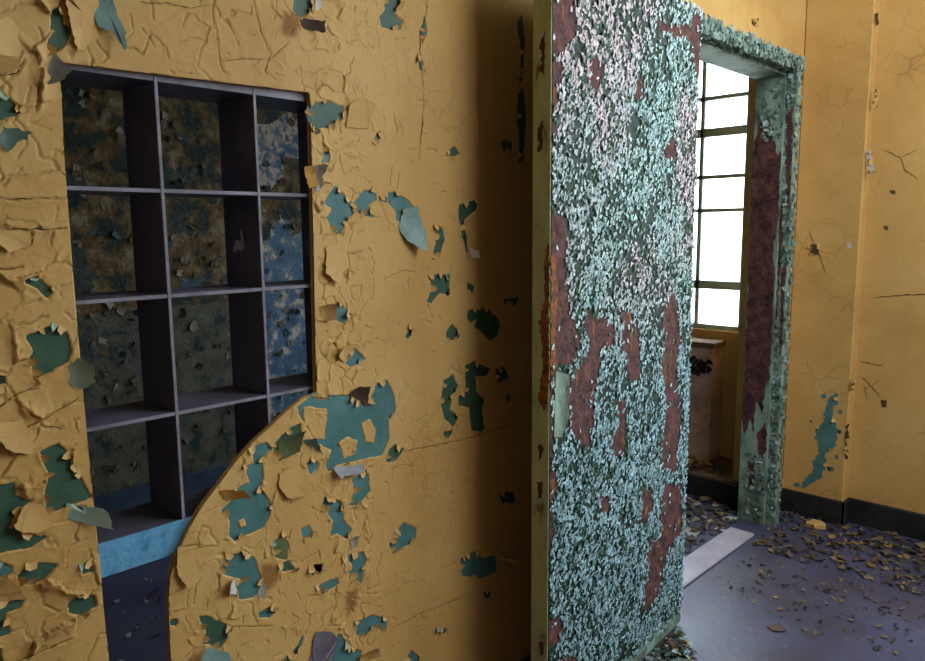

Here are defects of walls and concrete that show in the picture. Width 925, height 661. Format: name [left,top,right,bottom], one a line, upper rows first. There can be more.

crack [138,0,239,75]
corrosion [537,0,578,152]
corrosion [657,12,701,78]
crack [0,227,67,270]
peeling [23,302,144,403]
peeling [217,380,404,618]
peeling [257,97,444,379]
peeling [439,360,509,440]
corrosion [537,214,640,556]
corrosion [639,290,683,611]
peeling [549,0,805,661]
corrosion [742,106,794,486]